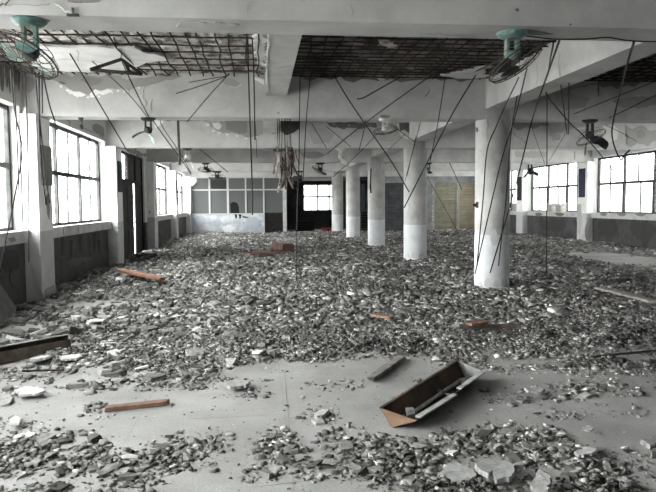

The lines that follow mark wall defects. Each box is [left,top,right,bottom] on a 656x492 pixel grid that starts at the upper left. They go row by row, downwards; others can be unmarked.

spalling [0,29,267,98]
spalling [292,35,557,83]
spalling [589,53,656,81]